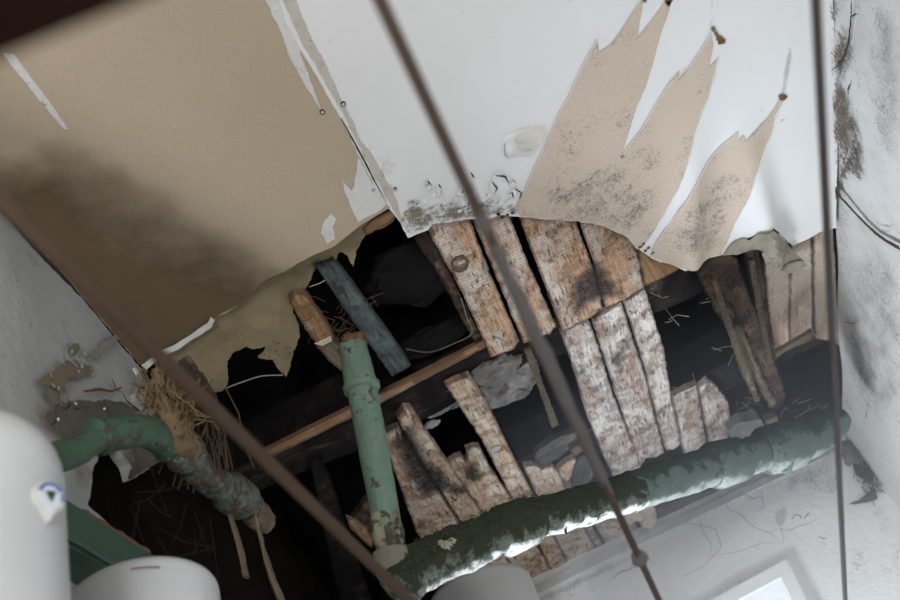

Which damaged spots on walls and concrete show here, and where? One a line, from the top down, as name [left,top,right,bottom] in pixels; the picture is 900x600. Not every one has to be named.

peeling [476,0,783,271]
water stain [830,6,861,185]
water stain [0,176,256,348]
peeling [320,214,336,244]
water stain [402,201,472,231]
water stain [75,287,149,364]
spalling [39,335,156,438]